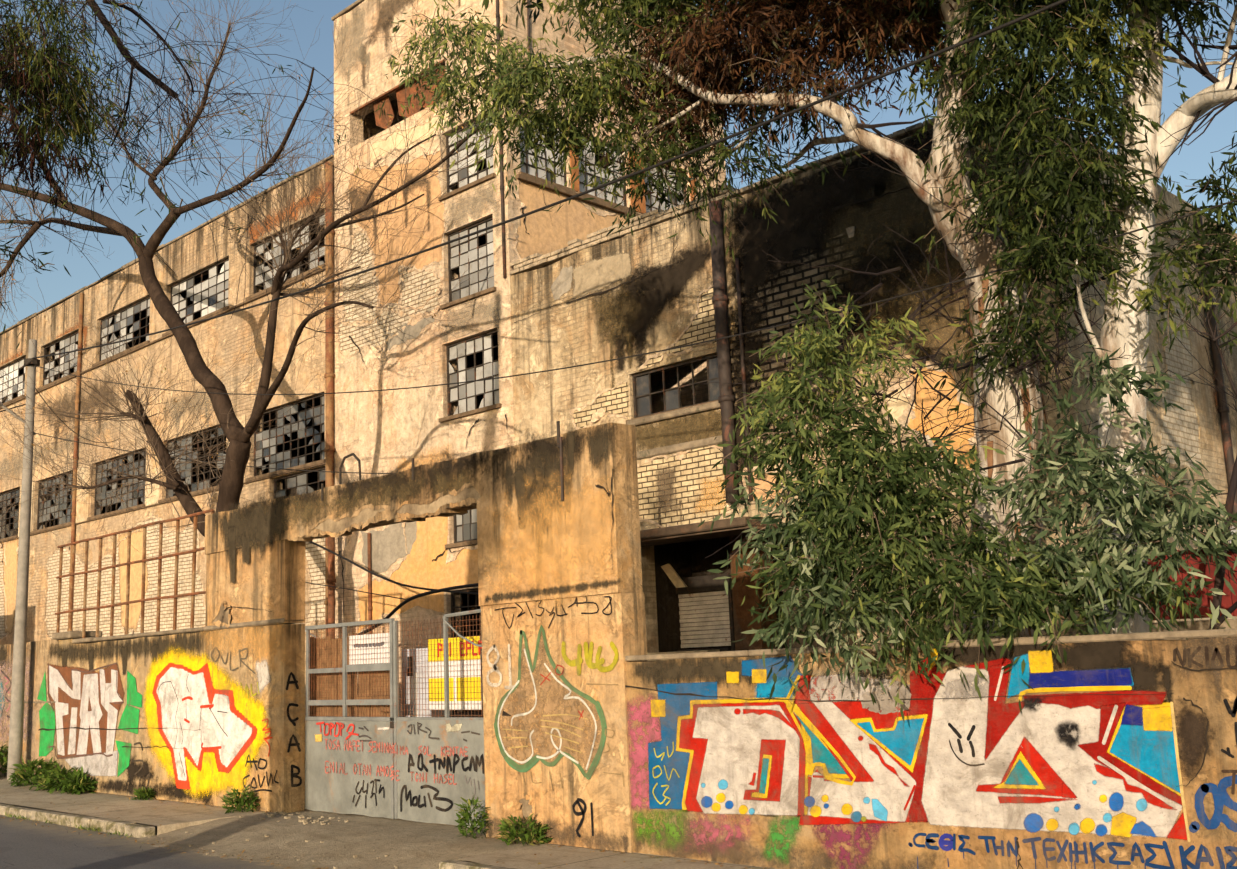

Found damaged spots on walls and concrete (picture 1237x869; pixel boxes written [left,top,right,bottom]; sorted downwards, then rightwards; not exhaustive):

flaking render [338,111,452,358]
damp [899,128,933,170]
damp [968,105,1025,240]
damp [573,243,711,388]
flaking render [569,226,858,449]
damp [635,152,972,502]
flaking render [305,481,484,633]
damp [213,425,613,584]
spalling [485,578,620,602]
flaking render [637,444,733,528]
flaking render [741,465,783,513]